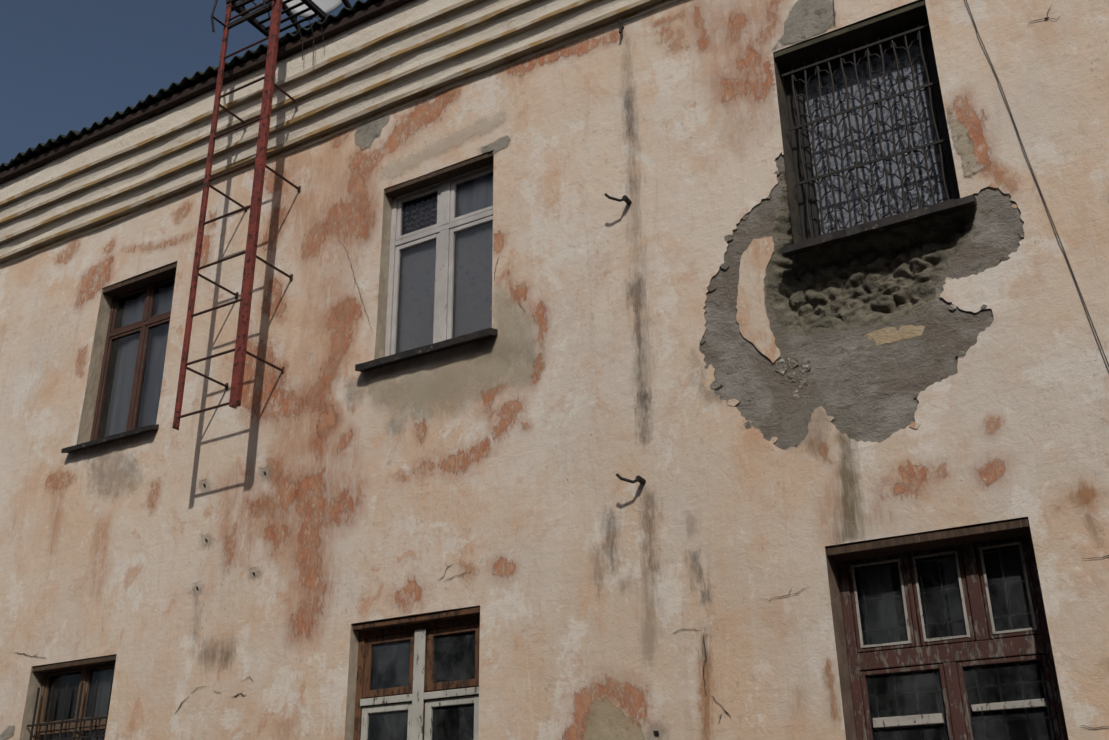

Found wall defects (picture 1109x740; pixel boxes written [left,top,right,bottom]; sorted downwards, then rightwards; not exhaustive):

peeling [506,30,623,76]
peeling [654,6,710,51]
peeling [720,0,780,102]
peeling [301,86,460,260]
spalling [698,96,1025,450]
peeling [242,296,362,638]
peeling [562,676,648,740]